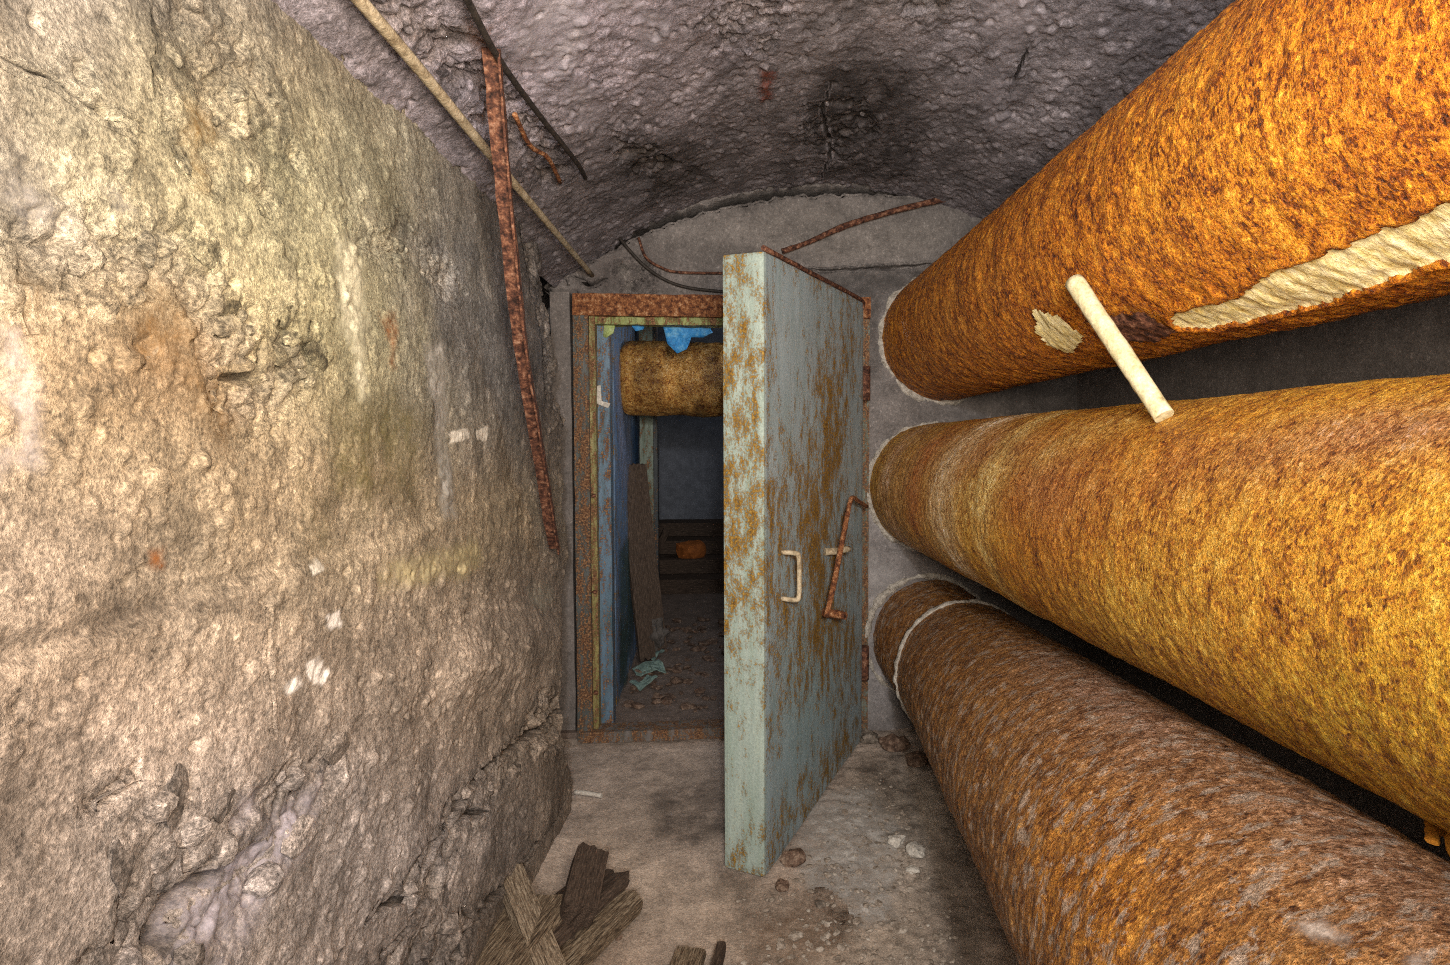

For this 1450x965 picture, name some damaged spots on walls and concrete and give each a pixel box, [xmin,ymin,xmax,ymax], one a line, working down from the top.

spalling [0,38,332,442]
spalling [66,732,350,965]
crack [365,709,557,965]